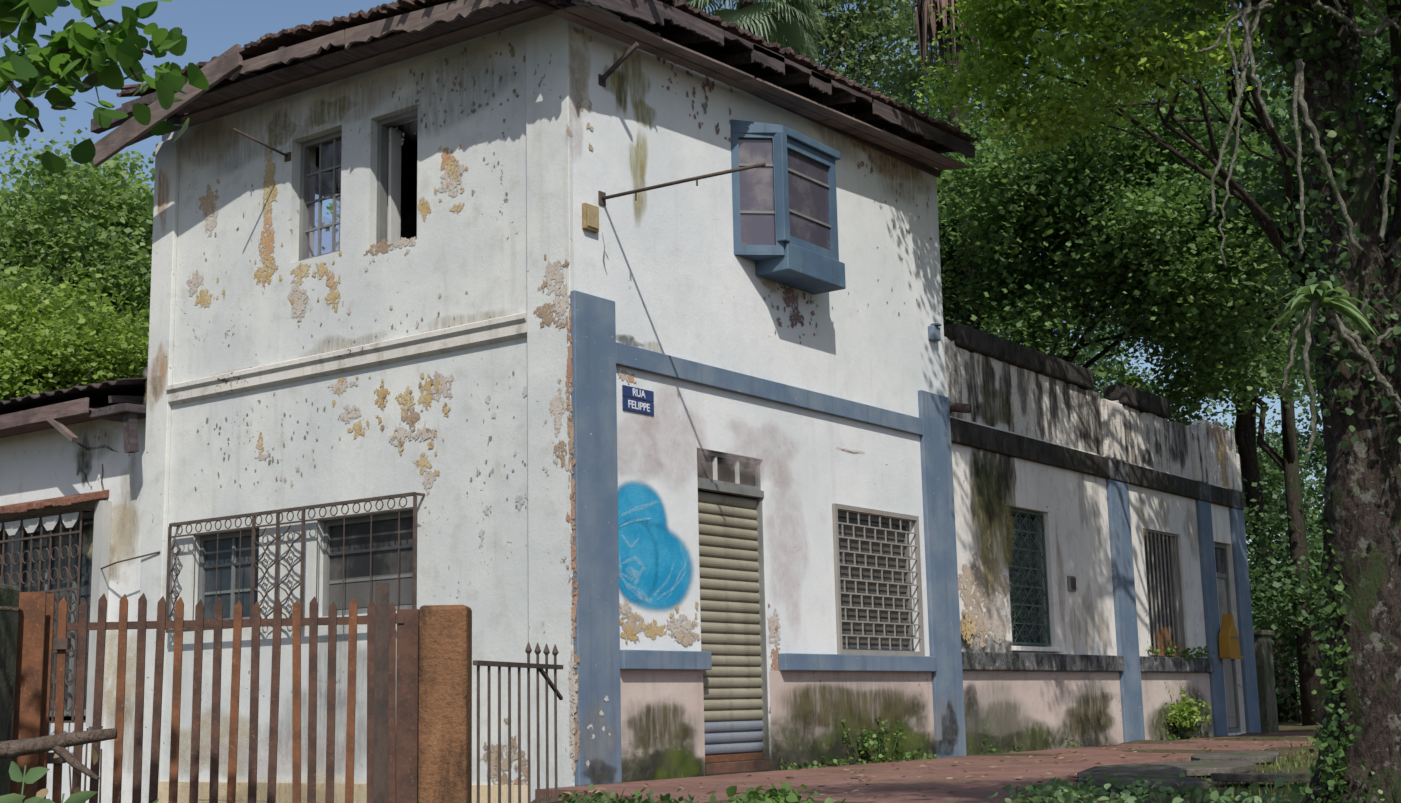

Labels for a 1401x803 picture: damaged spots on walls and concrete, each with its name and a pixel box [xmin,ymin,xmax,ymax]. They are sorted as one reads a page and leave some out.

peeling [418,144,475,222]
peeling [186,179,225,307]
peeling [236,148,355,348]
peeling [197,371,454,495]
leakage [965,353,1104,455]
leakage [1124,418,1188,466]
flaking render [466,254,613,785]
leakage [970,449,1016,579]
peeling [619,597,702,647]
leakage [961,619,1014,653]
mould [621,705,713,782]
leakage [758,685,936,771]